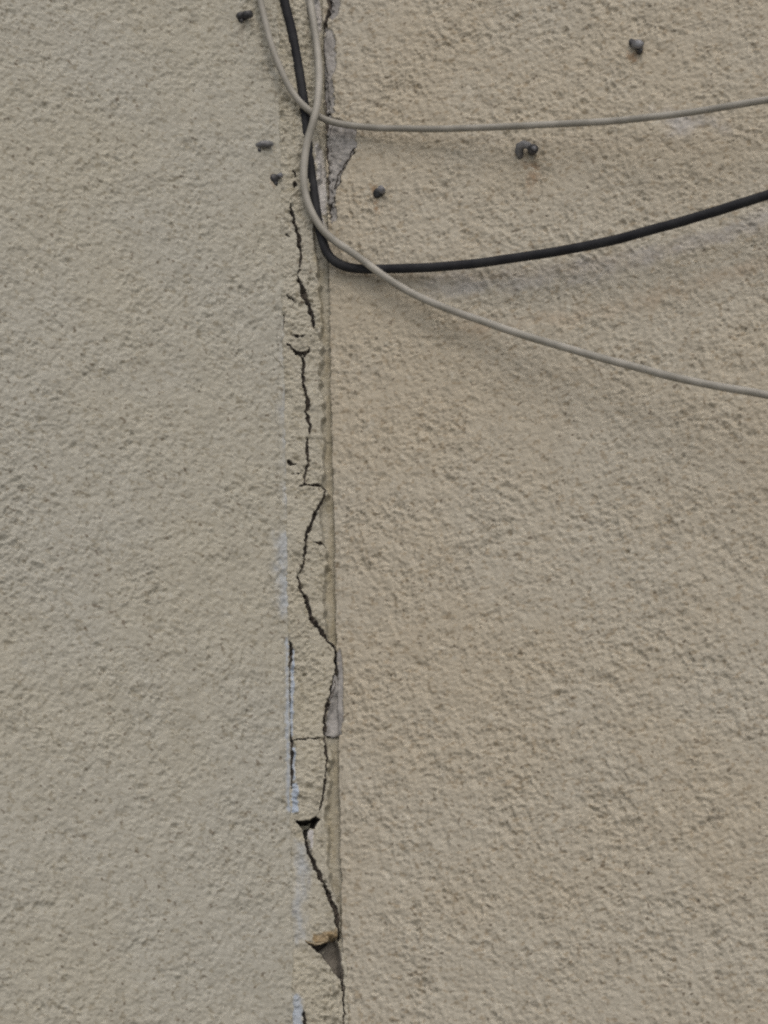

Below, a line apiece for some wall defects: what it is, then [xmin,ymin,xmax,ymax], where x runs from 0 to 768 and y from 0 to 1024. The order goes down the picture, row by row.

flaking render [304,0,357,241]
crack [283,170,337,810]
peeling [282,635,344,982]
crack [293,818,340,941]
crack [338,969,346,1024]